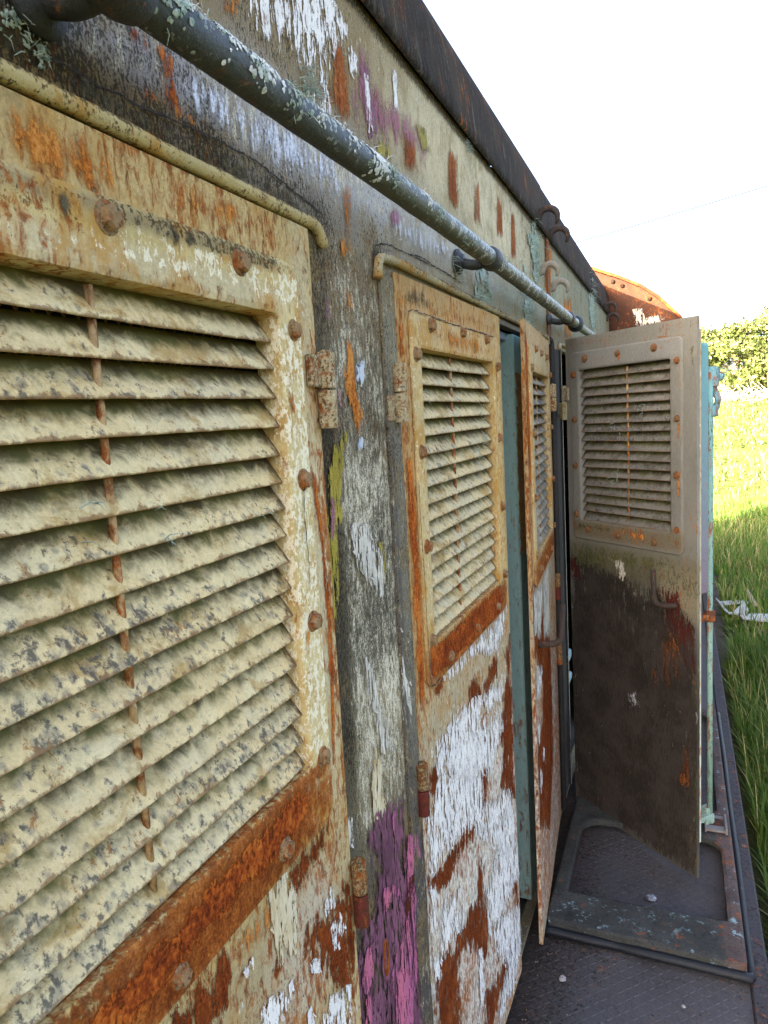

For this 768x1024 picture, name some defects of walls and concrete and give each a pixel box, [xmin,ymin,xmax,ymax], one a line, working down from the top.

rust [449,150,458,208]
rust [497,198,516,258]
peeling [351,521,384,599]
rust [406,457,502,711]
rust [533,583,553,829]
peeling [425,683,522,1024]
rust [91,790,309,1024]
peeling [267,872,300,967]
rust [304,880,356,1007]
peeling [323,882,347,951]
peeling [260,979,296,1024]
peeling [308,984,353,1024]